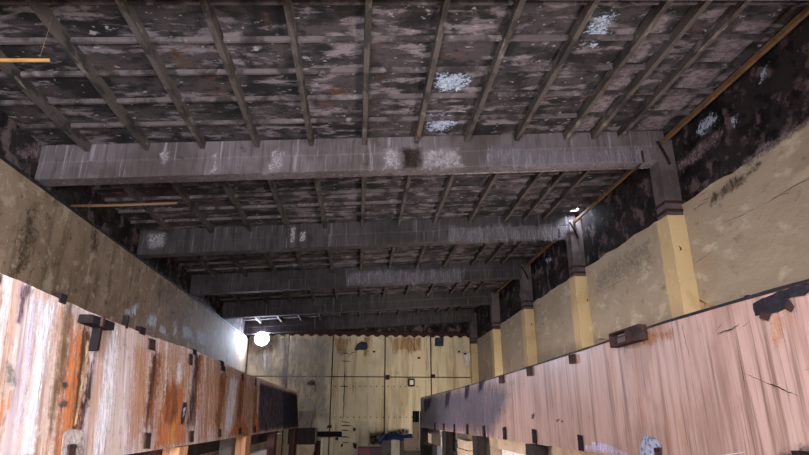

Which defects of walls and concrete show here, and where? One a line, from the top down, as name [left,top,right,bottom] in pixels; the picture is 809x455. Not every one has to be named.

water stain [710,162,761,206]
crack [726,179,808,222]
rust [46,302,94,455]
rust [129,345,259,449]